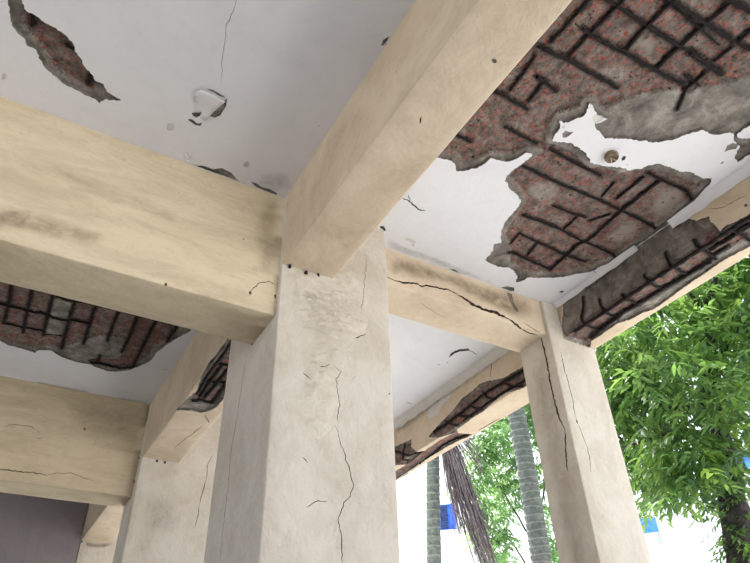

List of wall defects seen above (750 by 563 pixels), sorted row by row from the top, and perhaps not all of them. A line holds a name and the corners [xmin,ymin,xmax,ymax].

spalling [8,0,121,103]
spalling [437,0,750,347]
crack [0,469,86,479]
spalling [0,282,192,372]
spalling [177,339,231,413]
crack [303,364,354,563]
spalling [395,367,526,480]
crack [387,277,591,470]